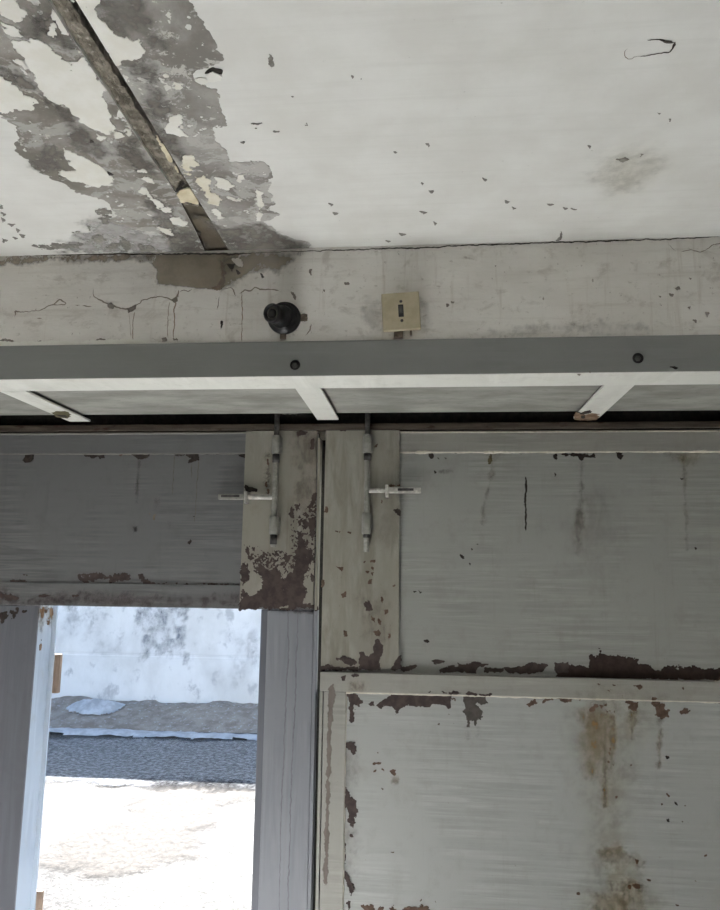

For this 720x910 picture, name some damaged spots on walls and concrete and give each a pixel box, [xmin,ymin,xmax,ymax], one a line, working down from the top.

peeling [0,0,206,252]
peeling [76,0,311,250]
crack [34,0,720,256]
damp [0,205,293,289]
crack [14,289,192,342]
crack [217,287,279,340]
rust [203,492,328,611]
rust [0,572,188,651]
rust [319,597,492,727]
rust [432,648,720,692]
rust [651,697,690,719]
rust [344,787,358,910]